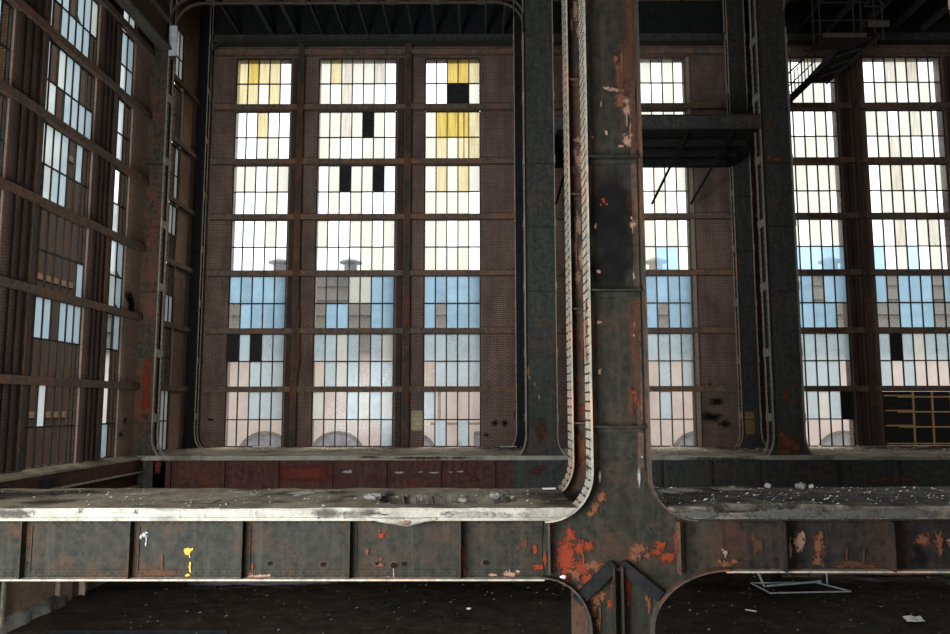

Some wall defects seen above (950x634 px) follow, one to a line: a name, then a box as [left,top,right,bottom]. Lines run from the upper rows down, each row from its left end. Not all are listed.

peeling [603,87,634,149]
corrosion [586,490,607,518]
corrosion [509,527,604,591]
corrosion [628,531,677,564]
corrosion [789,531,877,569]
corrosion [912,530,950,556]
corrosion [590,575,631,630]